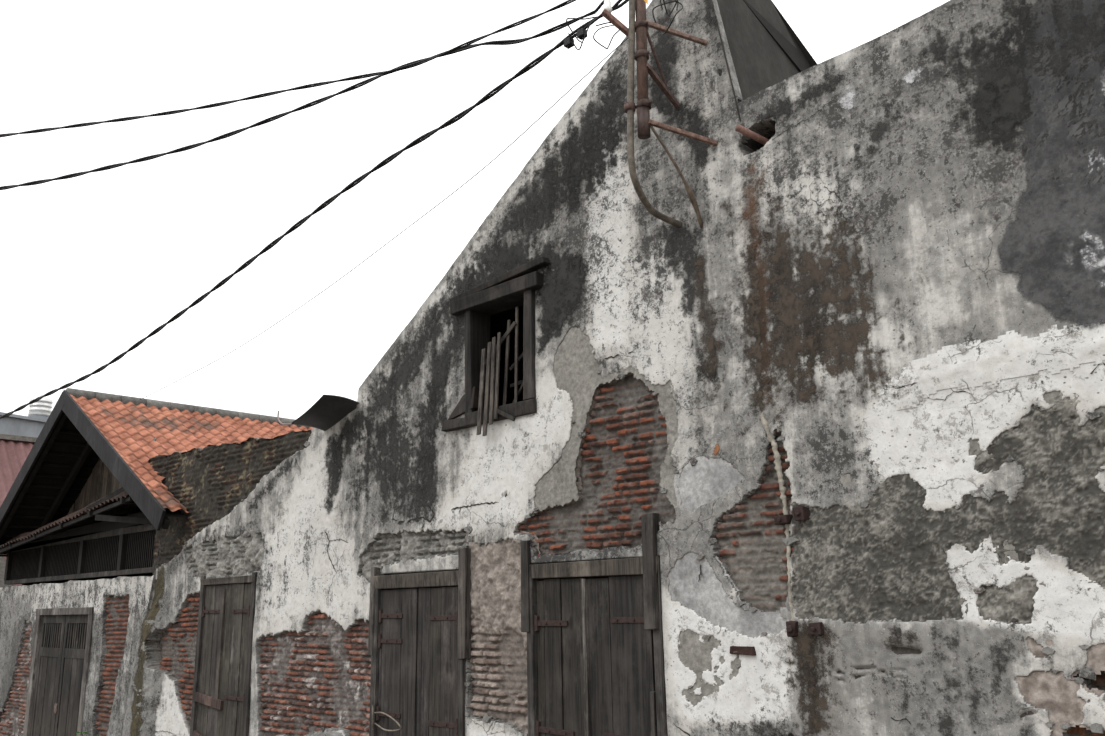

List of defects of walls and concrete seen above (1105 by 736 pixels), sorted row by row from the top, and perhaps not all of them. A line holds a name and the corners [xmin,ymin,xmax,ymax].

damp [909,0,1105,329]
damp [324,71,628,528]
flaking render [148,430,311,579]
flaking render [358,324,1105,736]
flaking render [95,595,129,736]
flaking render [159,593,200,723]
flaking render [259,610,371,736]